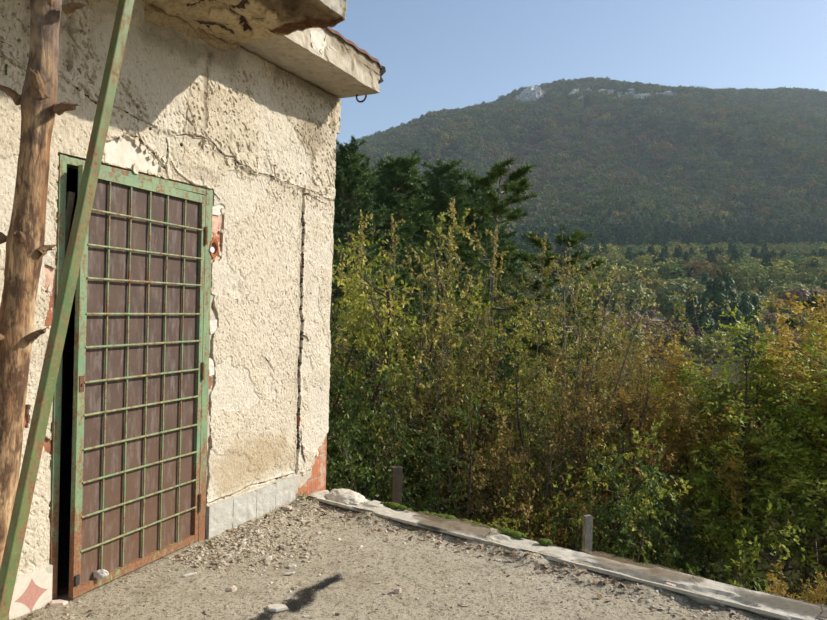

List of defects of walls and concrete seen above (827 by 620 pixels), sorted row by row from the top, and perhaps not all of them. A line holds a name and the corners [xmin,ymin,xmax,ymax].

crack [187,0,279,35]
peeling [104,136,159,175]
spalling [209,204,225,265]
spalling [44,265,56,327]
crack [61,76,326,504]
spalling [294,434,327,495]